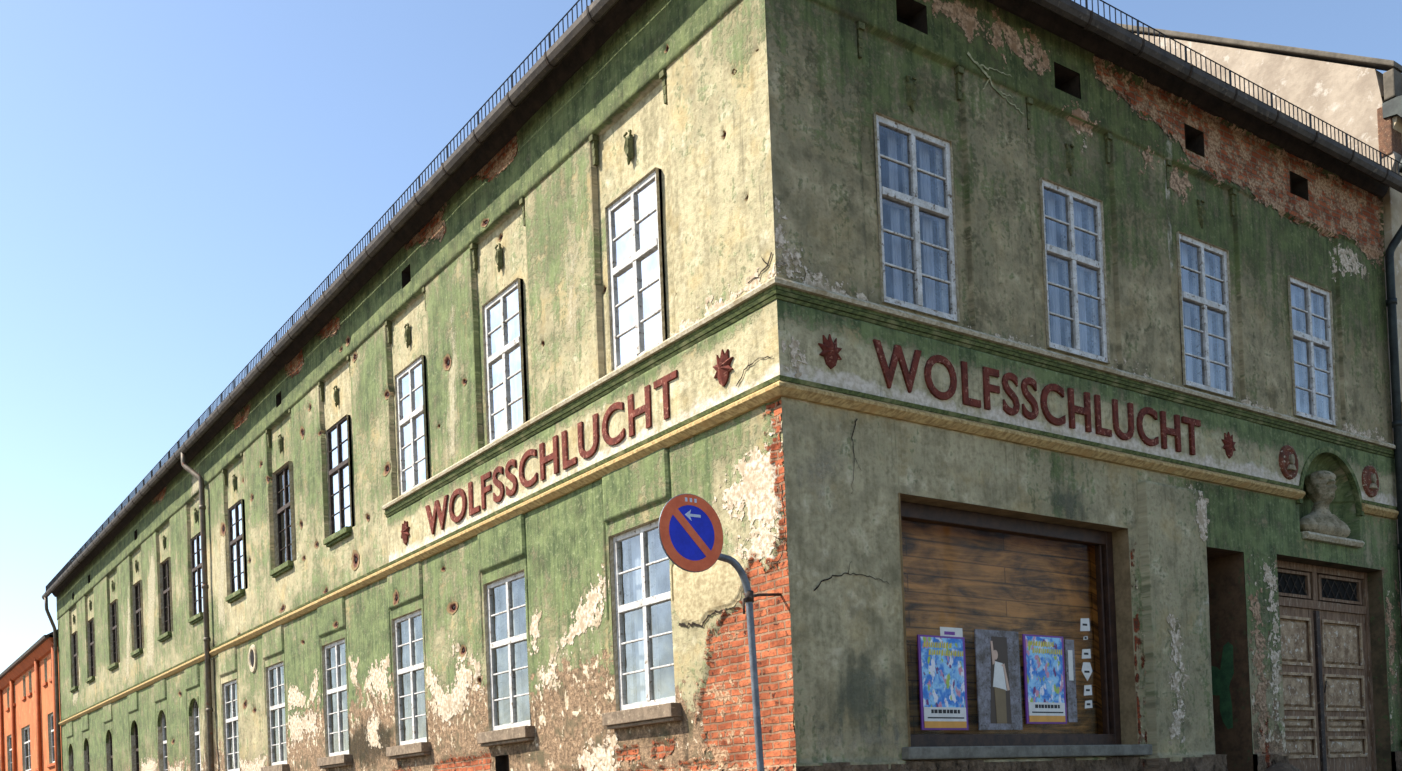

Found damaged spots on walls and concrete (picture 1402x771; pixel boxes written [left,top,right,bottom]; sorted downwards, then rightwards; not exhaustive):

peeling [919,0,1051,76]
spalling [1093,56,1385,282]
crack [736,356,773,386]
flaking render [424,635,485,727]
flaking render [528,564,610,700]
flaking render [571,400,796,771]
crack [679,607,734,628]
crack [814,561,889,591]
peeling [1248,562,1283,752]
flaking render [432,750,491,771]